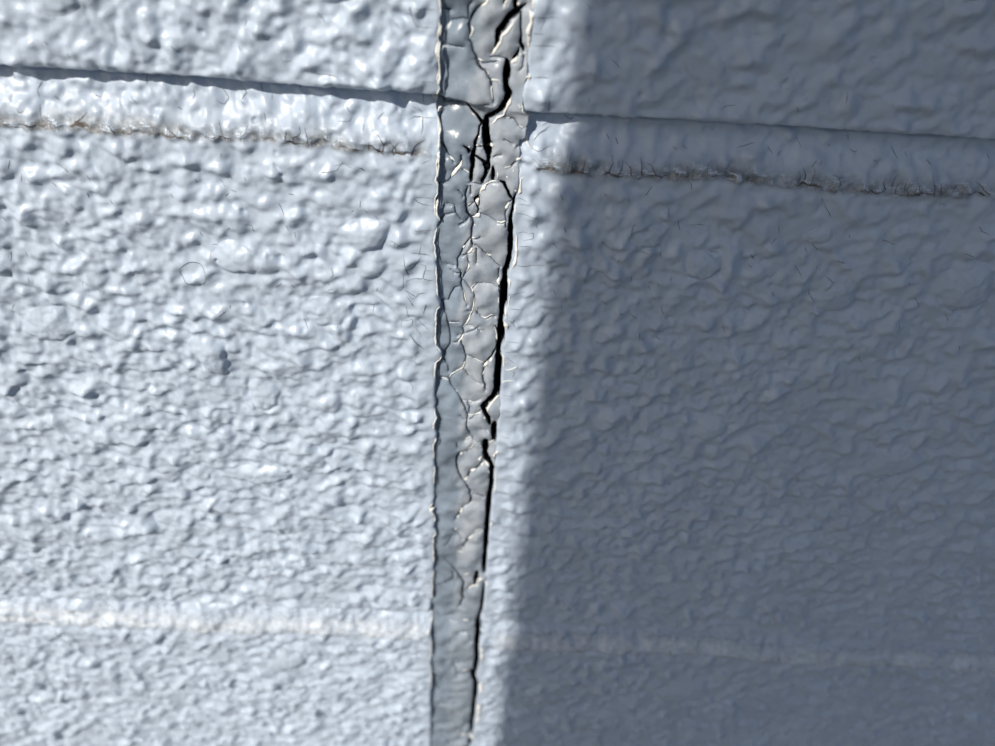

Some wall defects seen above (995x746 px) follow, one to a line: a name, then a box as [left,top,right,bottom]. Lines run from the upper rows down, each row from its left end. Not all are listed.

crack [2,82,182,138]
crack [739,137,944,217]
crack [181,225,254,285]
crack [207,0,762,744]